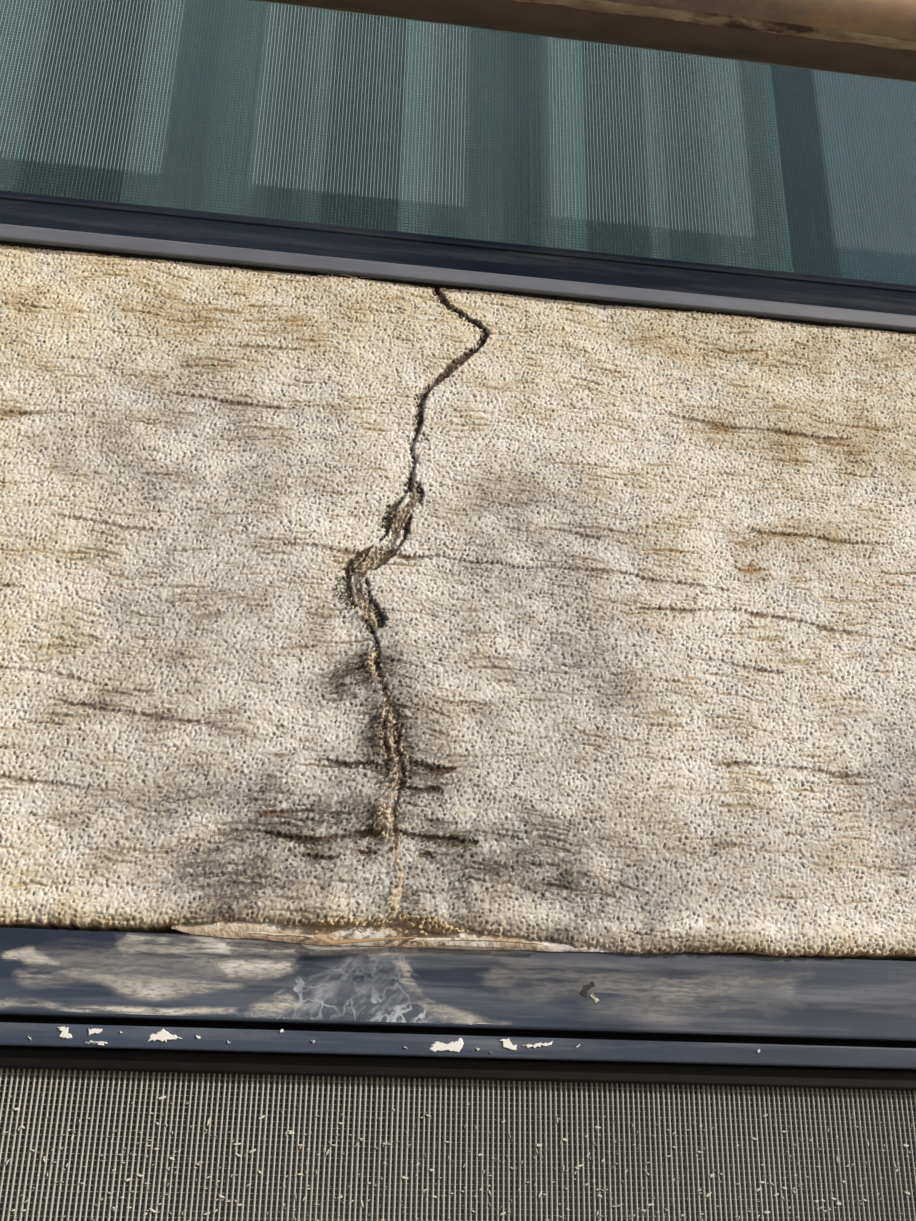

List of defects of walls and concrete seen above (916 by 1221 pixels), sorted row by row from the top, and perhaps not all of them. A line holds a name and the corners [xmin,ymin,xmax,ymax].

water stain [473,482,598,585]
crack [259,289,488,862]
water stain [159,588,234,661]
water stain [98,754,218,833]
water stain [152,645,648,946]
water stain [3,949,47,962]
water stain [115,935,412,999]